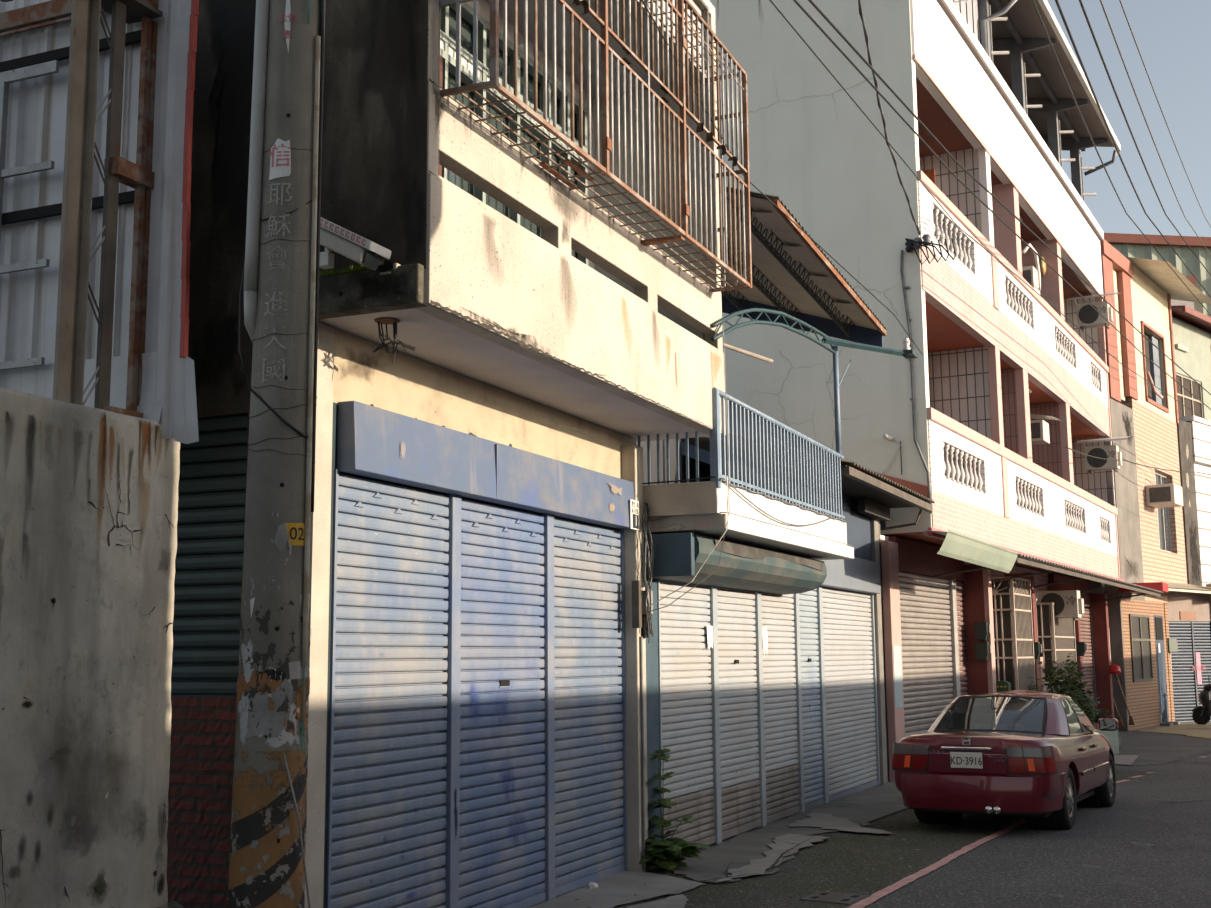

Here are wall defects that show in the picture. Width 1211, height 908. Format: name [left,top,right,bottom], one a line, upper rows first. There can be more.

rust [99,415,114,491]
rust [139,421,169,466]
crack [88,462,174,551]
peeling [235,539,311,749]
leakage [93,877,106,898]